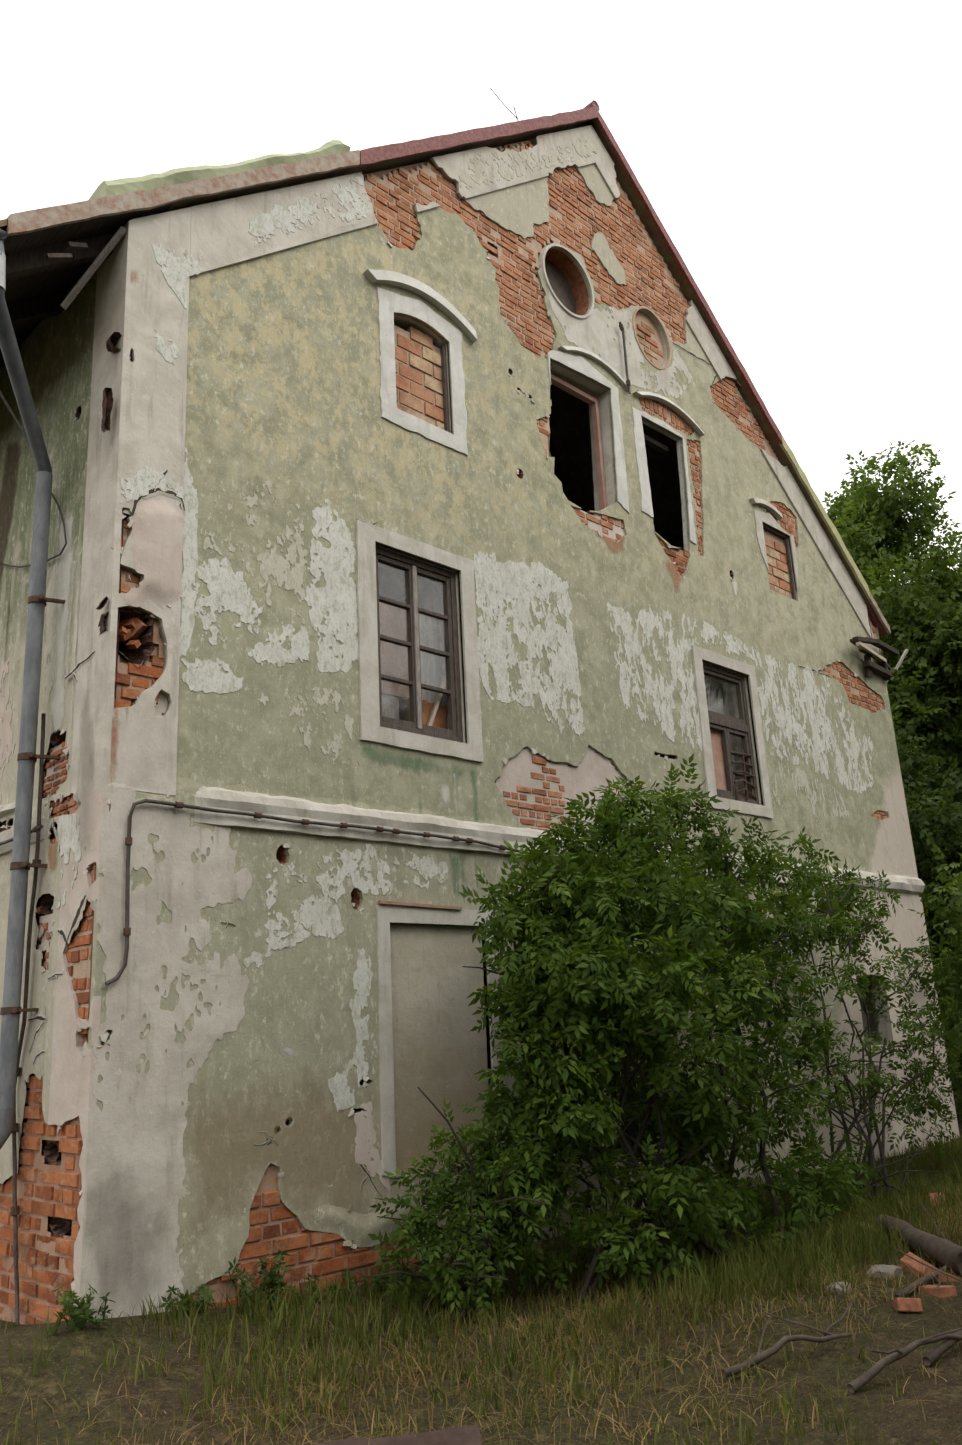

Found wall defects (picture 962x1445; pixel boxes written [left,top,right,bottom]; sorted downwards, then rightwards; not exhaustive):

flaking render [248,134,703,576]
flaking render [710,378,780,463]